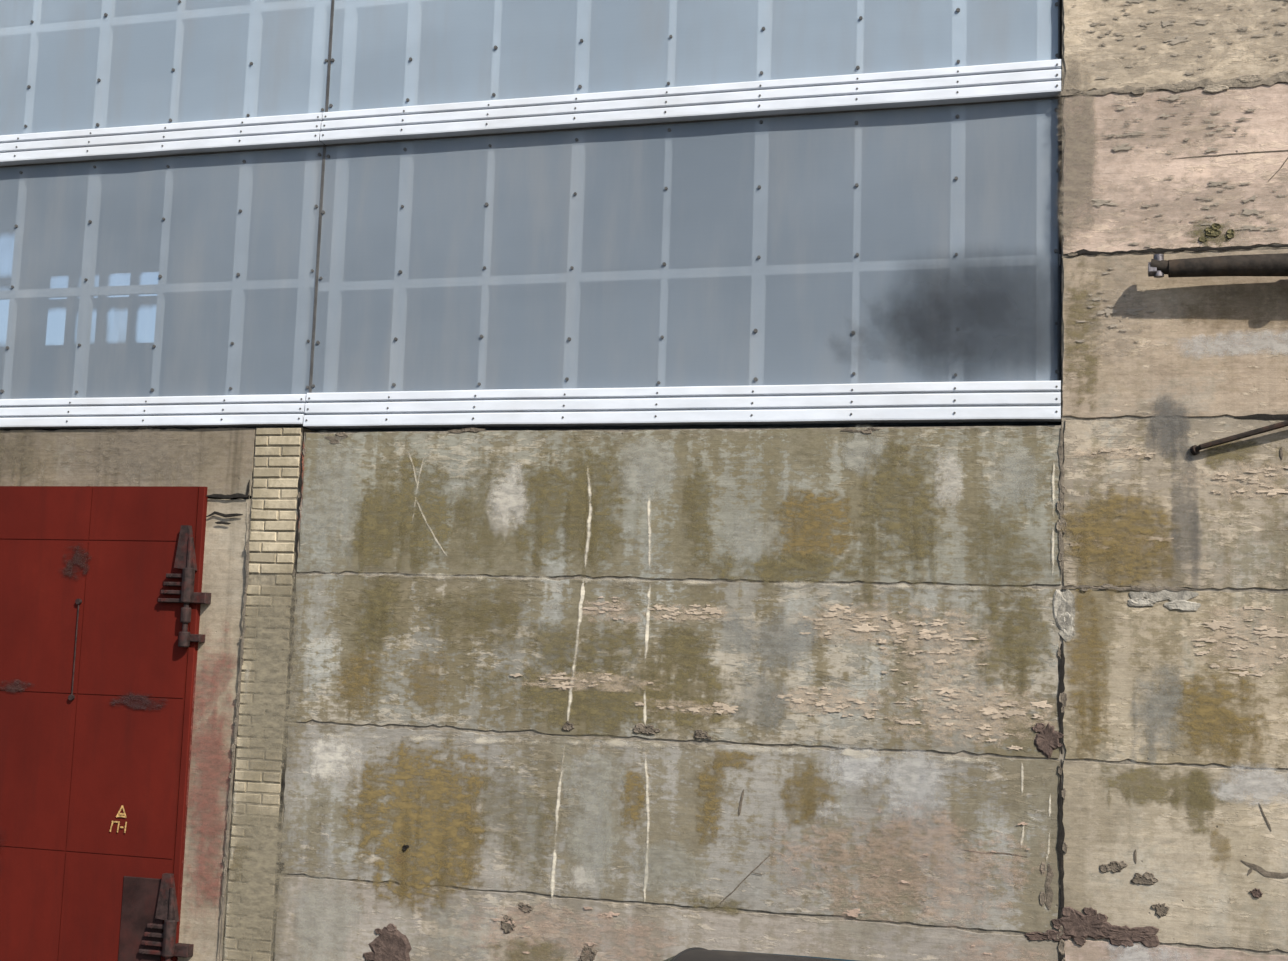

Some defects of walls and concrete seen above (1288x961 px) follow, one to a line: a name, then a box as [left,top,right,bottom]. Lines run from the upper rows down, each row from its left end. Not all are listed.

damp [842,429,882,472]
damp [491,467,524,524]
damp [624,441,675,566]
damp [567,484,592,720]
damp [311,734,360,778]
damp [830,749,939,817]
damp [1218,769,1288,801]
damp [555,754,612,887]
spalling [1024,860,1169,955]
spalling [363,923,412,961]